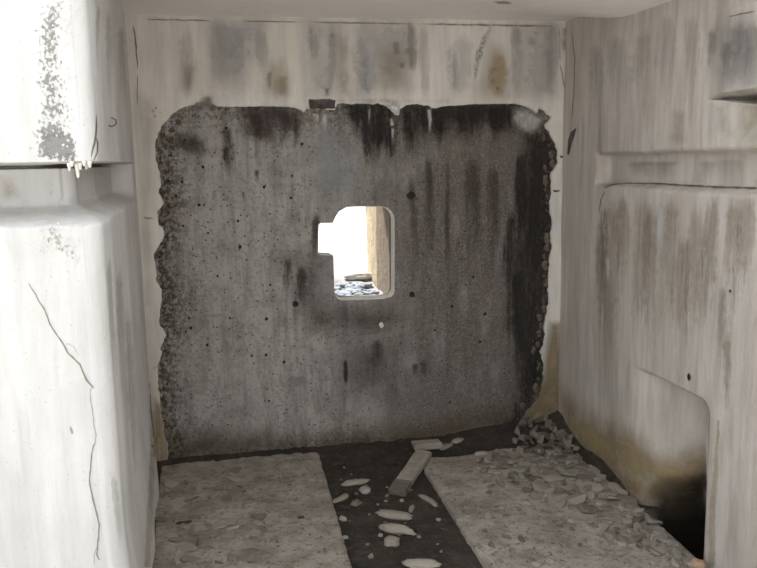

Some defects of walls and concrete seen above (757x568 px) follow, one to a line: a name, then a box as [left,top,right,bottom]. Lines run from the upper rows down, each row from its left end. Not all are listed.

peeling [32,1,77,162]
damp [223,130,231,159]
damp [245,106,298,138]
damp [347,103,396,152]
damp [312,217,320,249]
spalling [154,102,557,458]
damp [404,104,556,421]
crack [29,284,100,564]